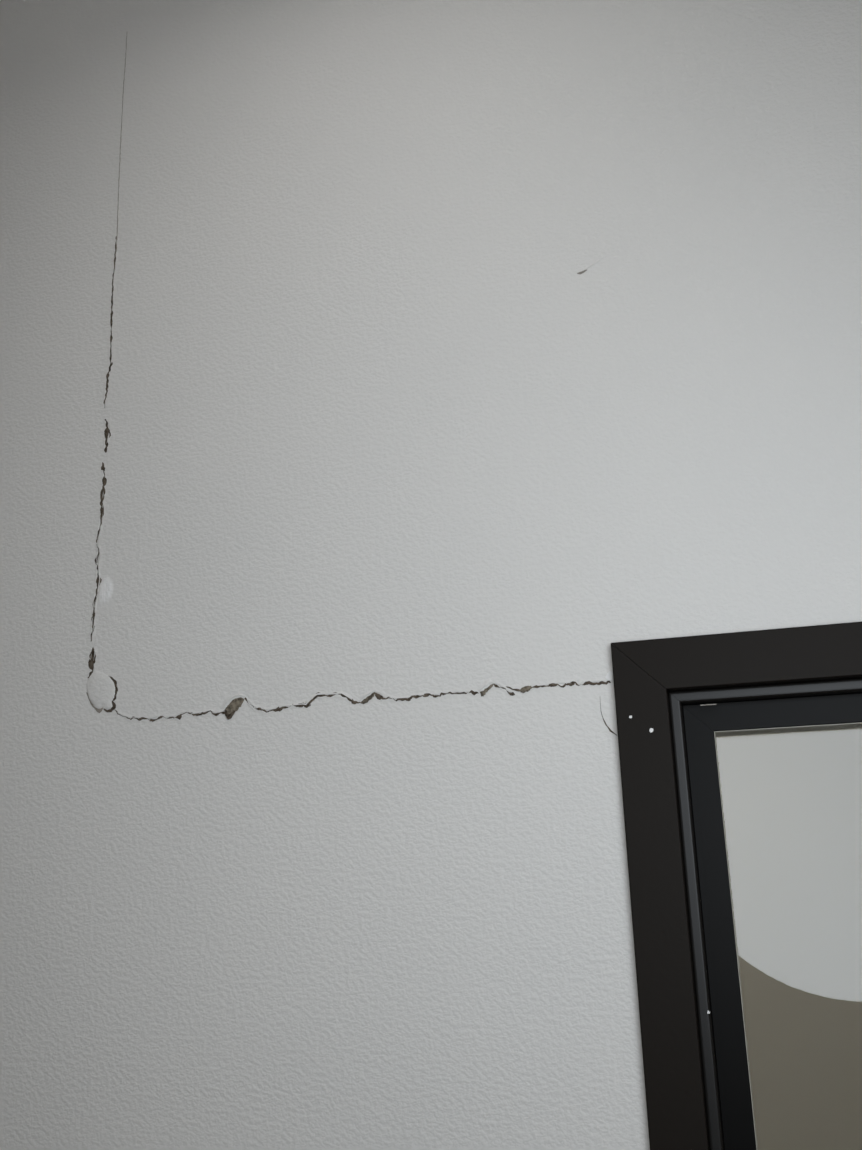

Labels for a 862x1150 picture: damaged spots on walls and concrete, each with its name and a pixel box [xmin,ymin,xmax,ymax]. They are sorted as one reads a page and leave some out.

crack [86,36,127,678]
crack [114,677,616,735]